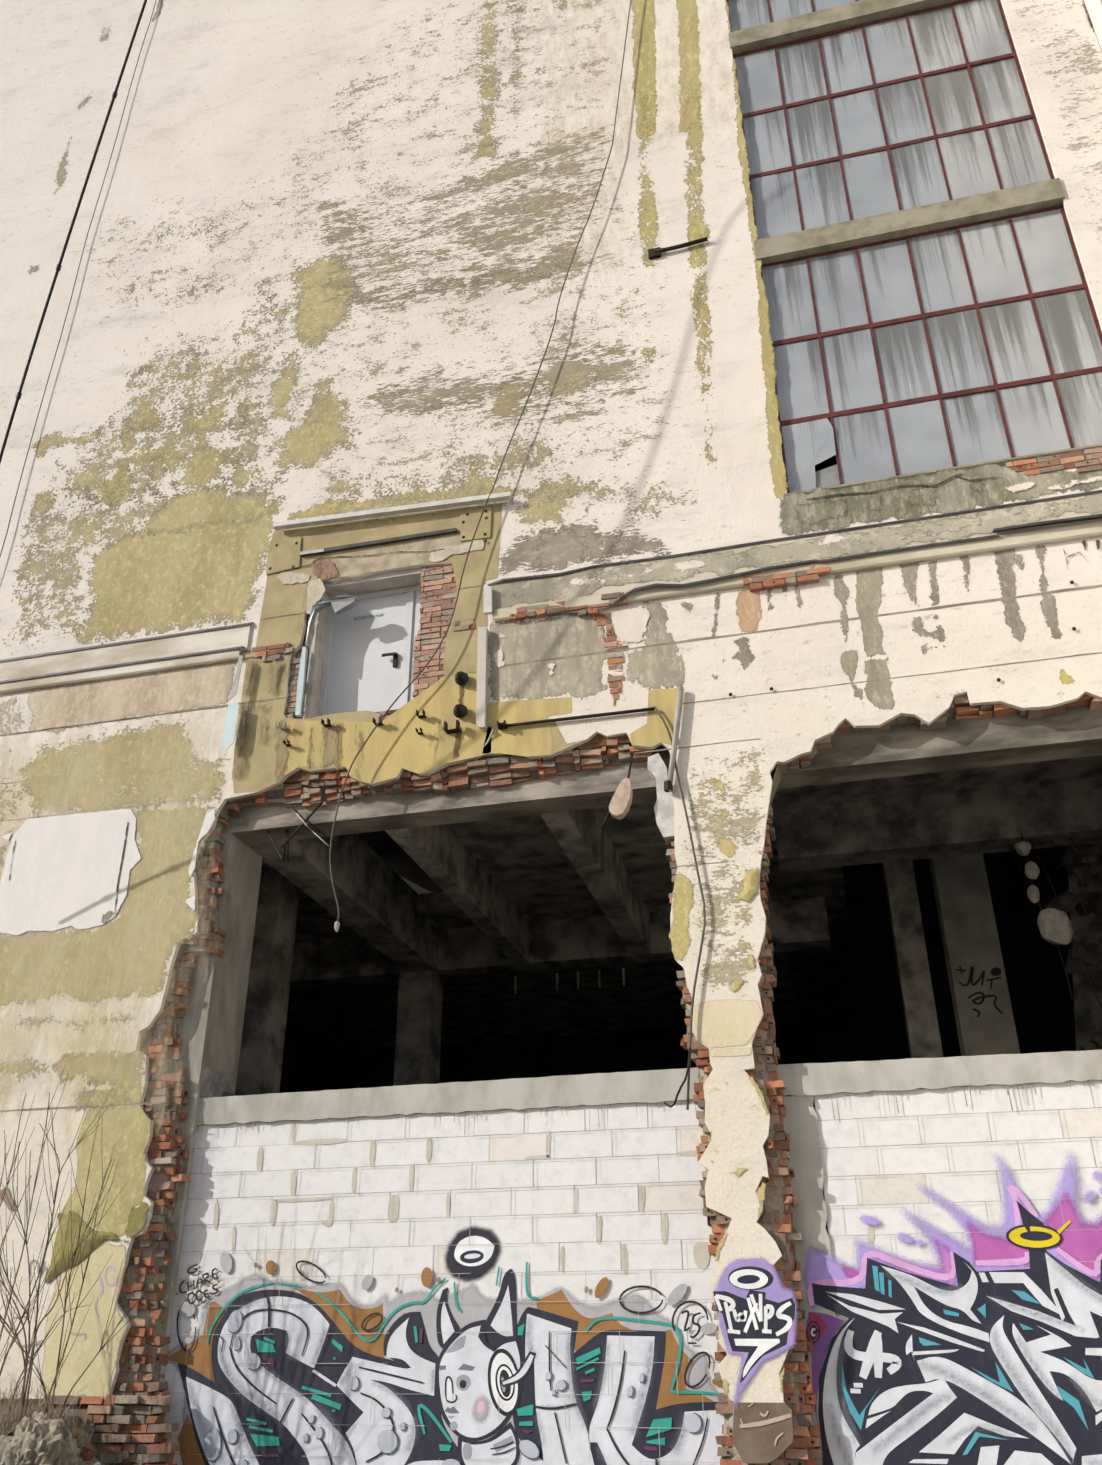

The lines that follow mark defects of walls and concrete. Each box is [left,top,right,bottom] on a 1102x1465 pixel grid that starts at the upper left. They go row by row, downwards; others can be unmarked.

peeling [54,136,72,195]
water stain [631,0,659,267]
water stain [676,0,712,401]
peeling [85,198,264,313]
peeling [731,59,788,499]
spalling [1004,447,1102,493]
peeling [672,559,706,574]
water stain [488,464,1102,710]
spalling [743,534,860,611]
peeling [493,633,507,667]
peeling [712,636,755,679]
spalling [200,1066,235,1098]